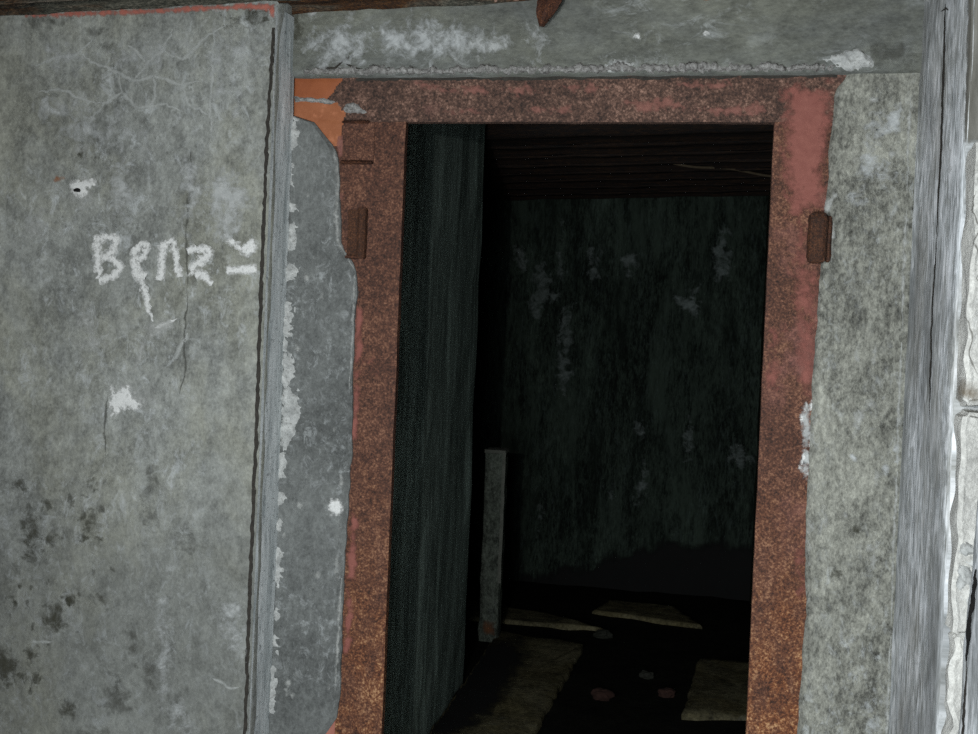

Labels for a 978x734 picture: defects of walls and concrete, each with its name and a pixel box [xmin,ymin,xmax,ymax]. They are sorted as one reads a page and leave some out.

rust [536,0,562,27]
spalling [293,78,367,155]
efflorescence [211,175,247,238]
water stain [45,594,79,630]
water stain [0,653,19,685]